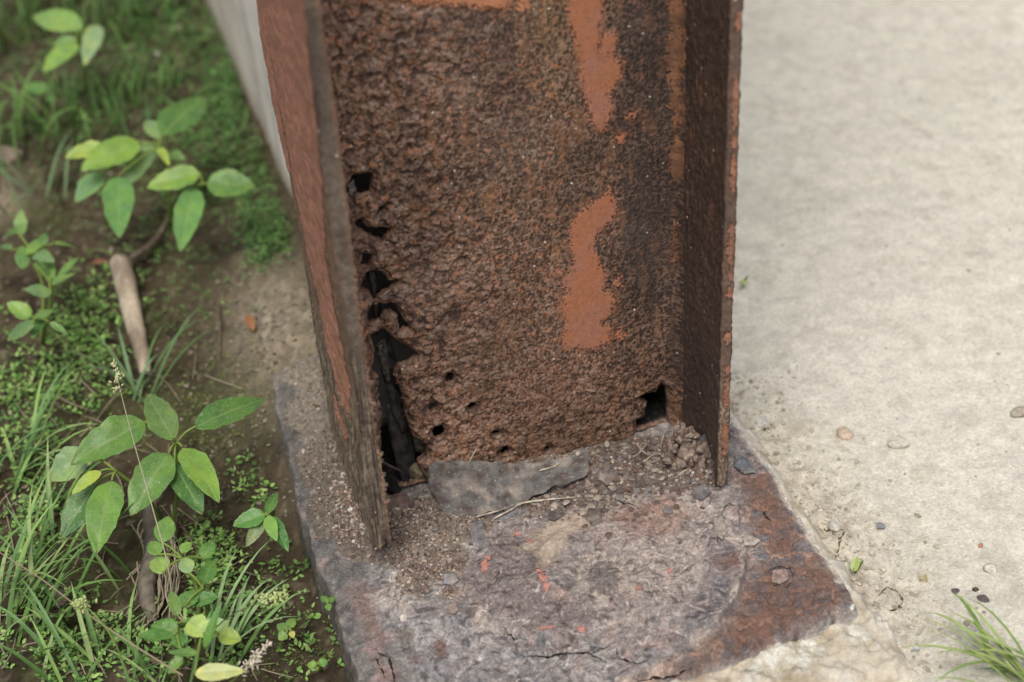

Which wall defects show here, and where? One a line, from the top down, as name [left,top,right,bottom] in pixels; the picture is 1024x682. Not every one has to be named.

rust [345,170,447,510]
rust [634,382,674,433]
crack [503,627,692,682]